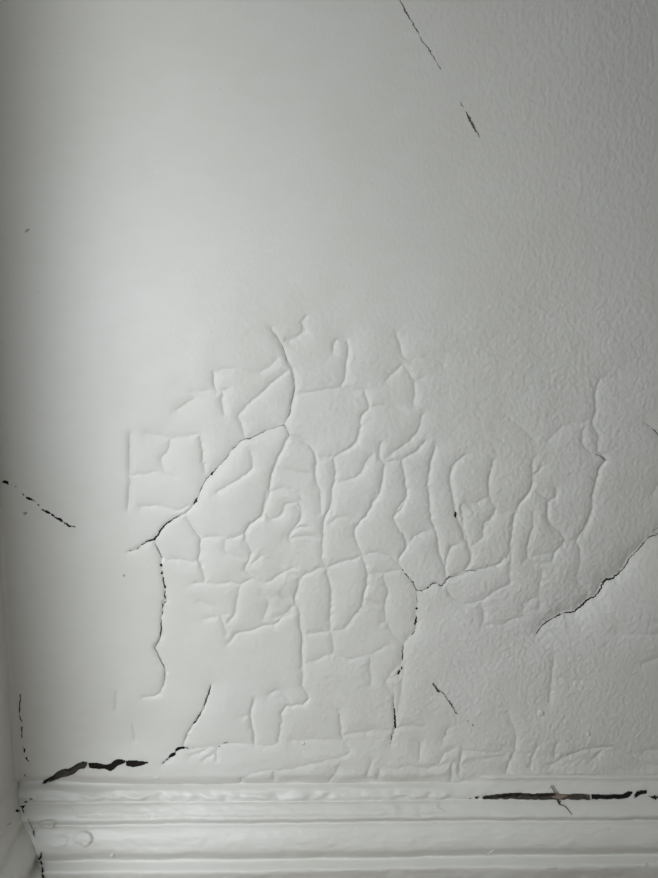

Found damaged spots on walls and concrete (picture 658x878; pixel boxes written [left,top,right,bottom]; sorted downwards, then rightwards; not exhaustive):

crack [400,1,441,70]
crack [460,102,480,137]
crack [2,480,75,527]
crack [130,329,295,685]
crack [397,569,475,675]
crack [536,528,658,634]
crack [8,686,211,878]
crack [469,790,658,800]